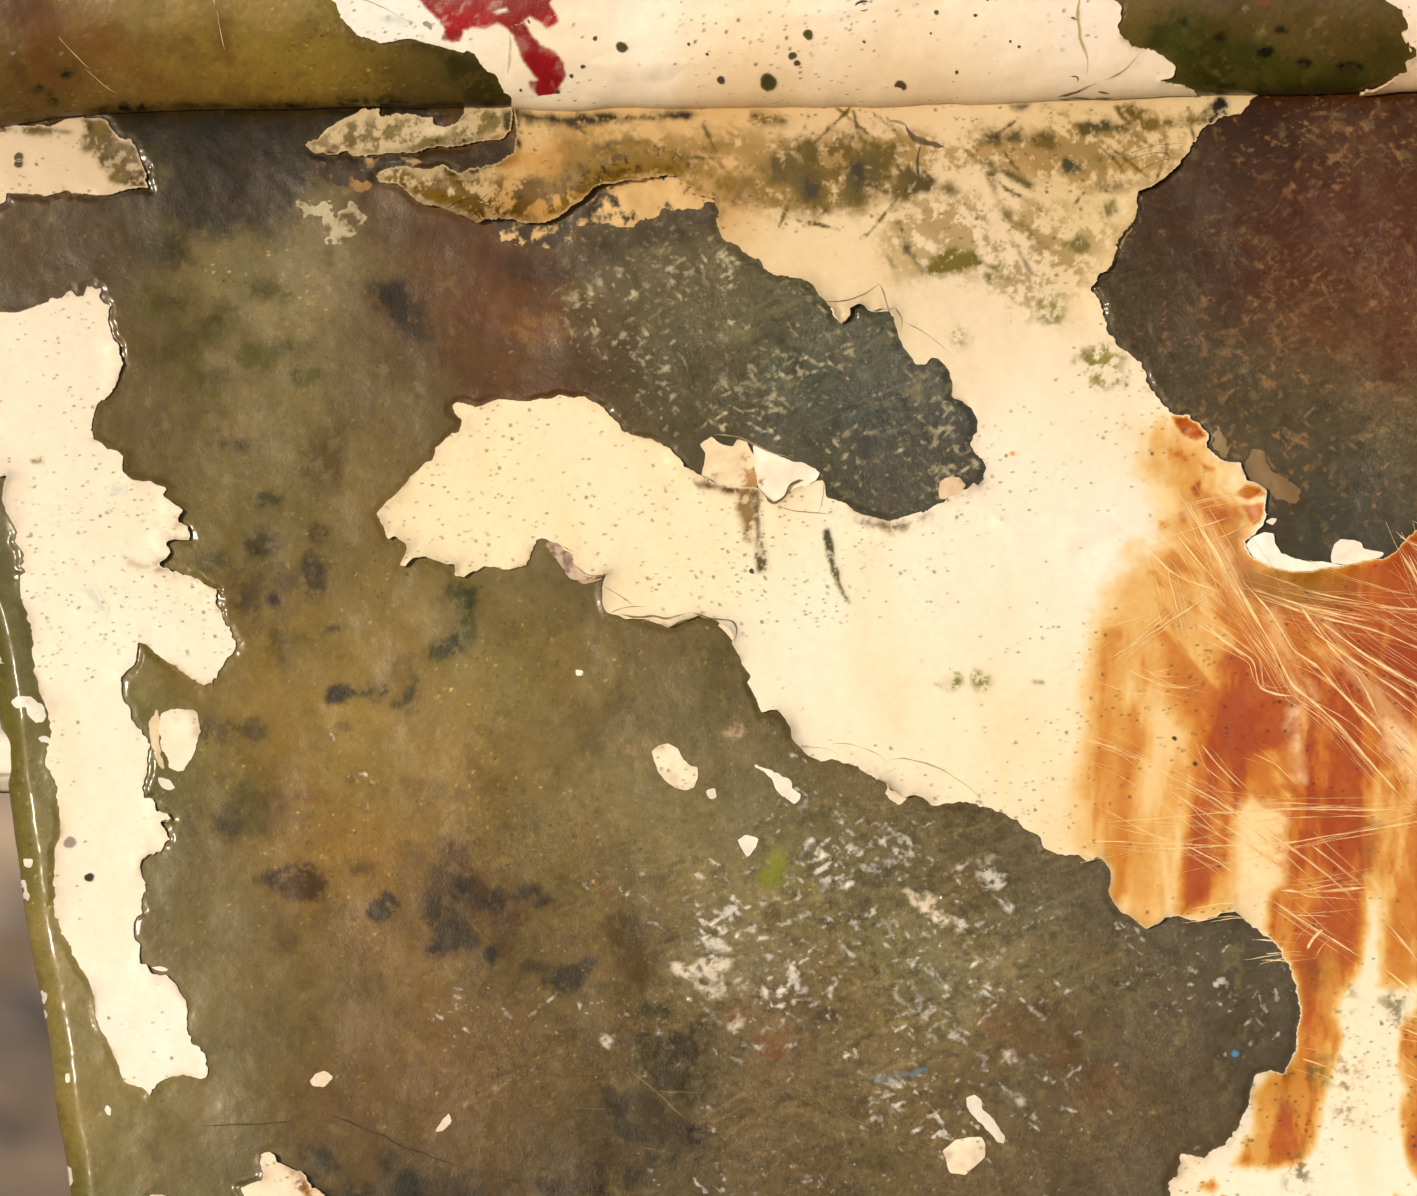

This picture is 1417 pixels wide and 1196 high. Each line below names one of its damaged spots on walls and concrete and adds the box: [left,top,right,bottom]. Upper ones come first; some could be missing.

peeling [0,45,131,137]
peeling [120,0,454,108]
water stain [306,94,1232,337]
peeling [1091,0,1417,345]
corrosion [416,262,598,407]
mould [944,322,975,355]
mould [1067,335,1132,394]
peeling [1142,268,1417,571]
peeling [0,160,1301,1196]
corrosion [1059,108,1417,1196]
corrosion [818,1082,894,1135]
corrosion [969,989,1139,1117]